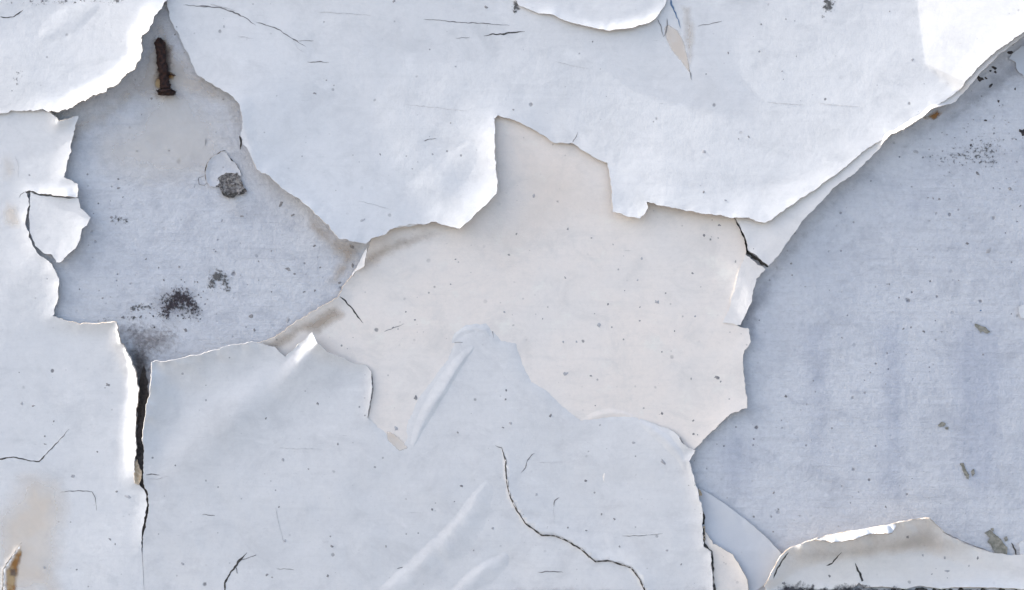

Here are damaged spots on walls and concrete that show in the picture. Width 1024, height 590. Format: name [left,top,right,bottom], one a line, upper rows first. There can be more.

water stain [121,269,241,328]
peeling [166,0,1024,450]
crack [736,222,768,267]
crack [0,429,69,462]
crack [136,366,149,548]
crack [224,553,256,590]
crack [495,445,645,590]
peeling [142,323,1024,590]